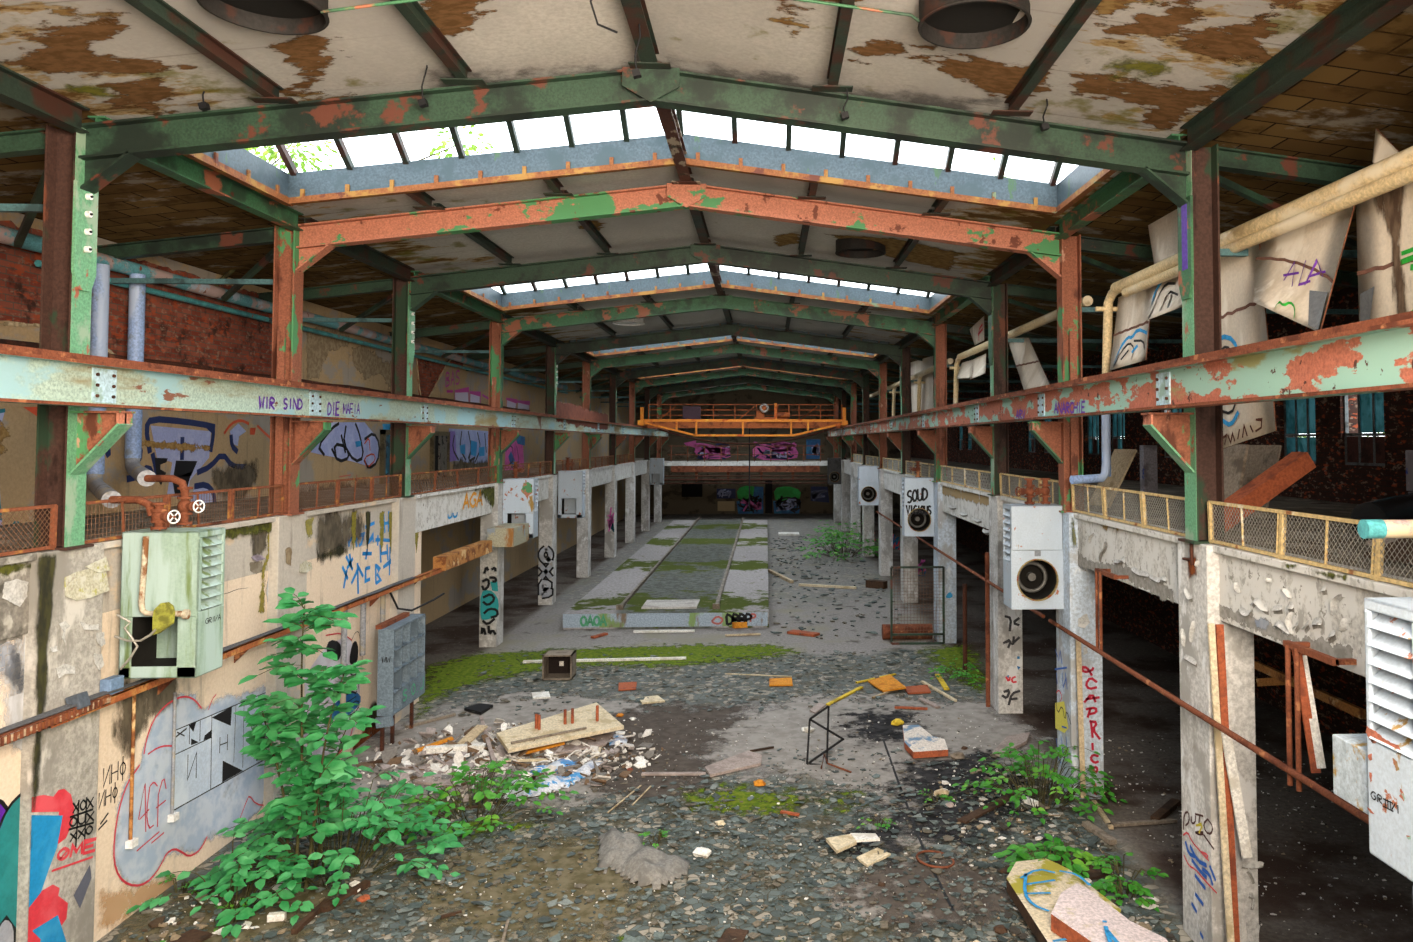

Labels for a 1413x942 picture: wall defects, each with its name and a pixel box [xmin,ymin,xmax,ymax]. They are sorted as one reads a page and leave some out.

peeling [0,7,198,116]
peeling [267,35,358,102]
peeling [421,0,497,37]
peeling [847,39,1230,133]
peeling [1092,0,1304,67]
peeling [2,579,29,607]
peeling [50,621,105,678]
peeling [64,557,111,601]
peeling [1078,533,1193,603]
peeling [1179,620,1197,668]
peeling [1219,577,1353,658]